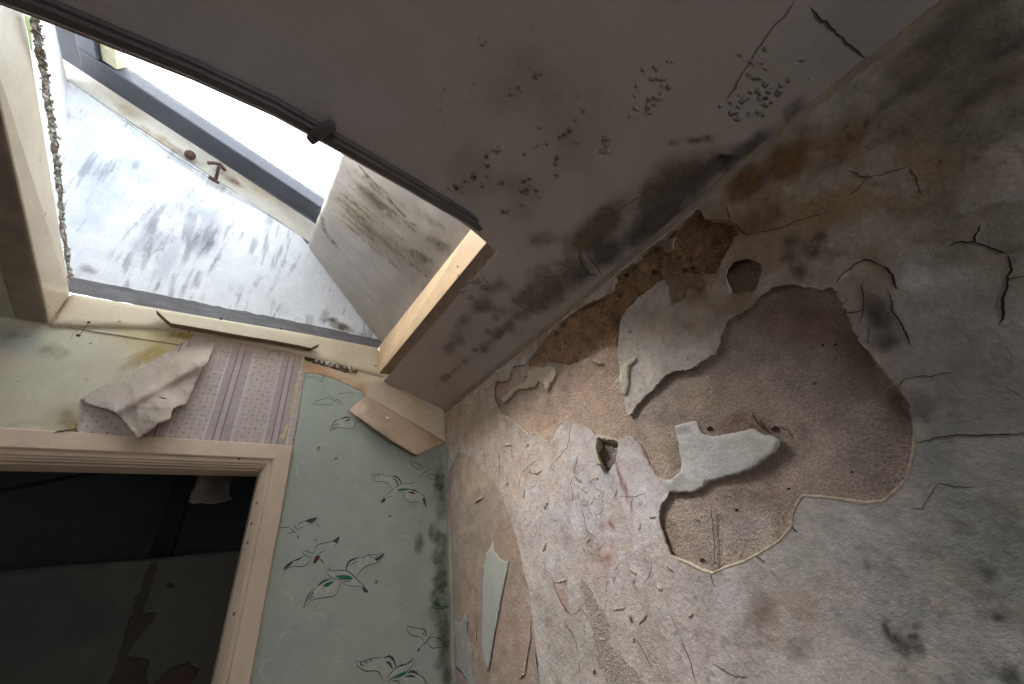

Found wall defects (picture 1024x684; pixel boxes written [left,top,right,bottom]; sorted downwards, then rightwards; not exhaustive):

crack [724,0,865,103]
leakage [337,175,428,268]
leakage [573,133,806,265]
crack [706,167,922,236]
crack [833,259,912,347]
crack [948,224,1024,325]
flaking render [495,212,918,574]
leakage [418,530,451,684]
peeling [449,452,539,684]